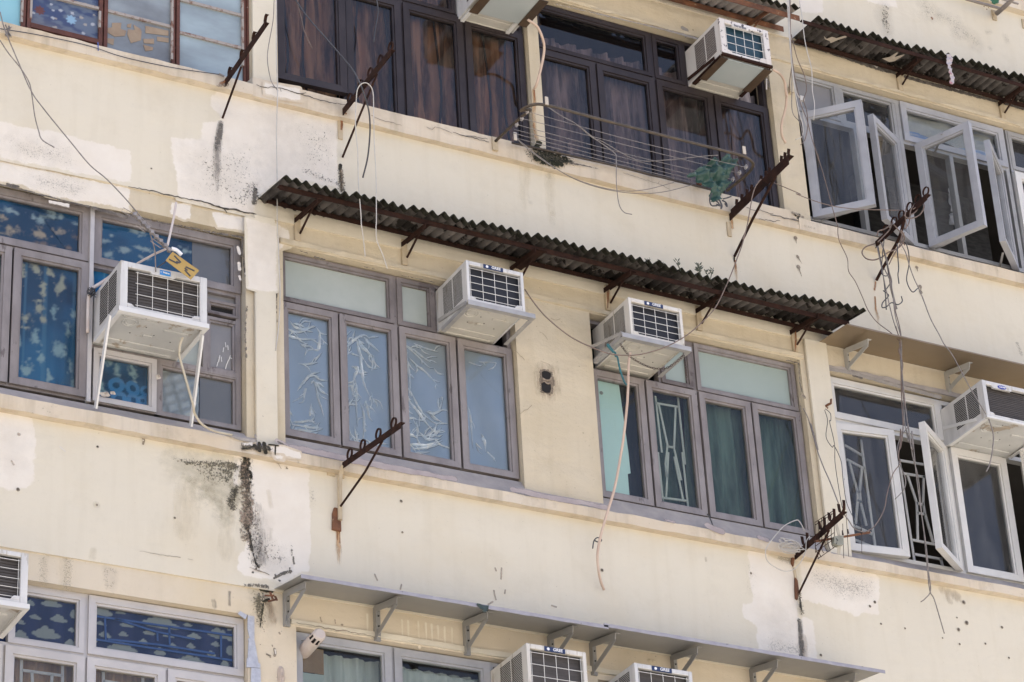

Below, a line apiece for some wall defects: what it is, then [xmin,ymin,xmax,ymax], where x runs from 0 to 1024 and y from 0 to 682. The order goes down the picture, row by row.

water stain [215,121,223,172]
mould [175,441,279,569]
water stain [797,592,805,656]